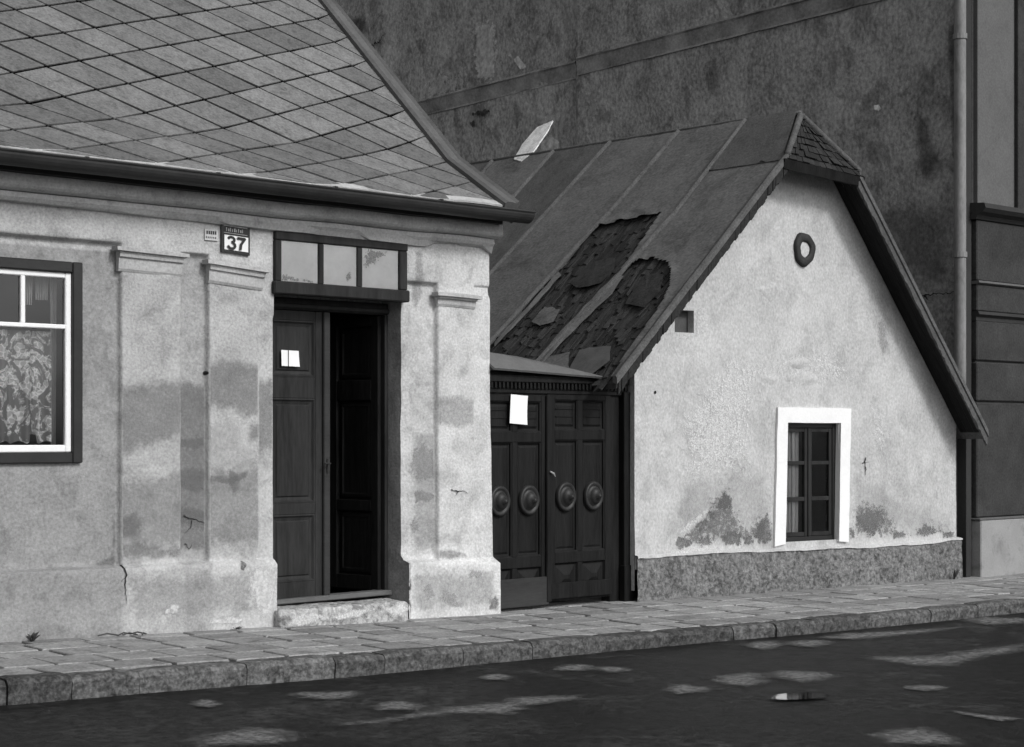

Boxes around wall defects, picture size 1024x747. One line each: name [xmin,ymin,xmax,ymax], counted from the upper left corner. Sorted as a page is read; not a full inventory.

leakage [114,363,273,557]
peeling [666,488,772,554]
peeling [850,502,954,539]